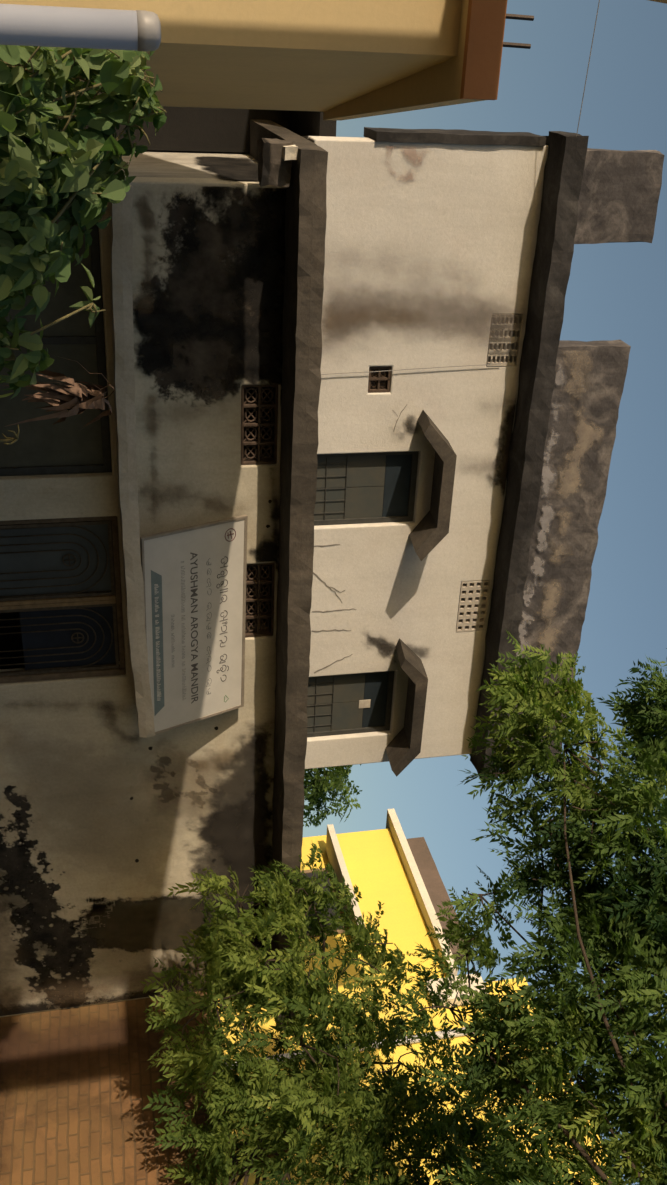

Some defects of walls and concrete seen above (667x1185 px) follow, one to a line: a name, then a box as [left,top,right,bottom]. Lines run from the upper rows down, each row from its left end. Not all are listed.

leakage [133,156,286,405]
leakage [327,294,489,336]
crack [312,544,356,674]
leakage [190,728,274,954]
leakage [0,962,236,1093]